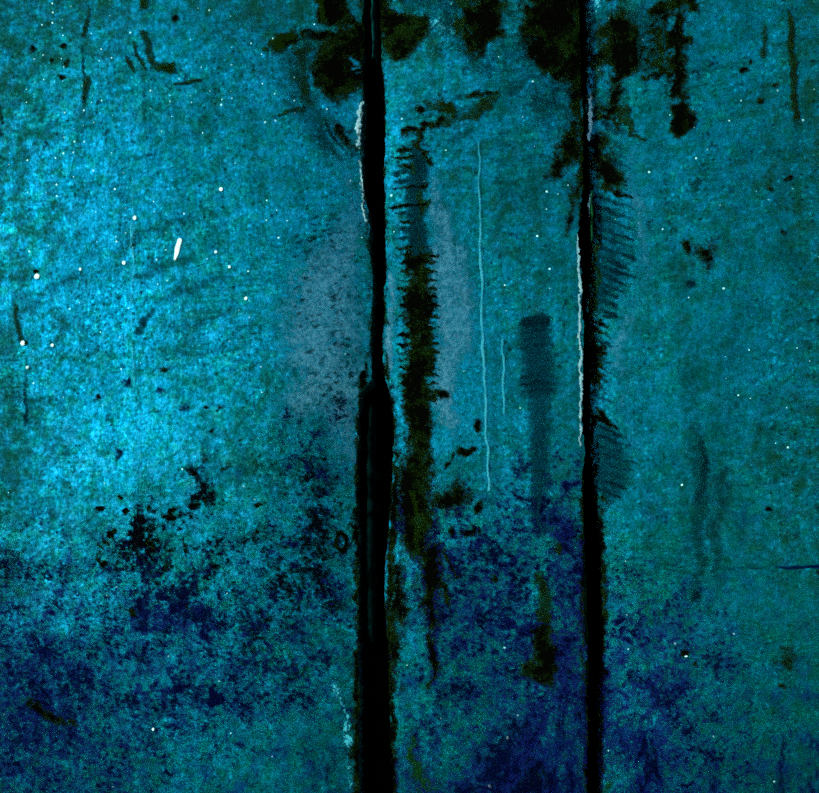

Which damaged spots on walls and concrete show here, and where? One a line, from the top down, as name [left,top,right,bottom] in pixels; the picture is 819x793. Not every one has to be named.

water stain [272,0,341,117]
water stain [349,461,361,793]
water stain [354,285,373,449]
crack [357,0,395,793]
water stain [382,149,436,793]
water stain [519,314,554,535]
crack [577,0,604,793]
water stain [564,42,647,793]